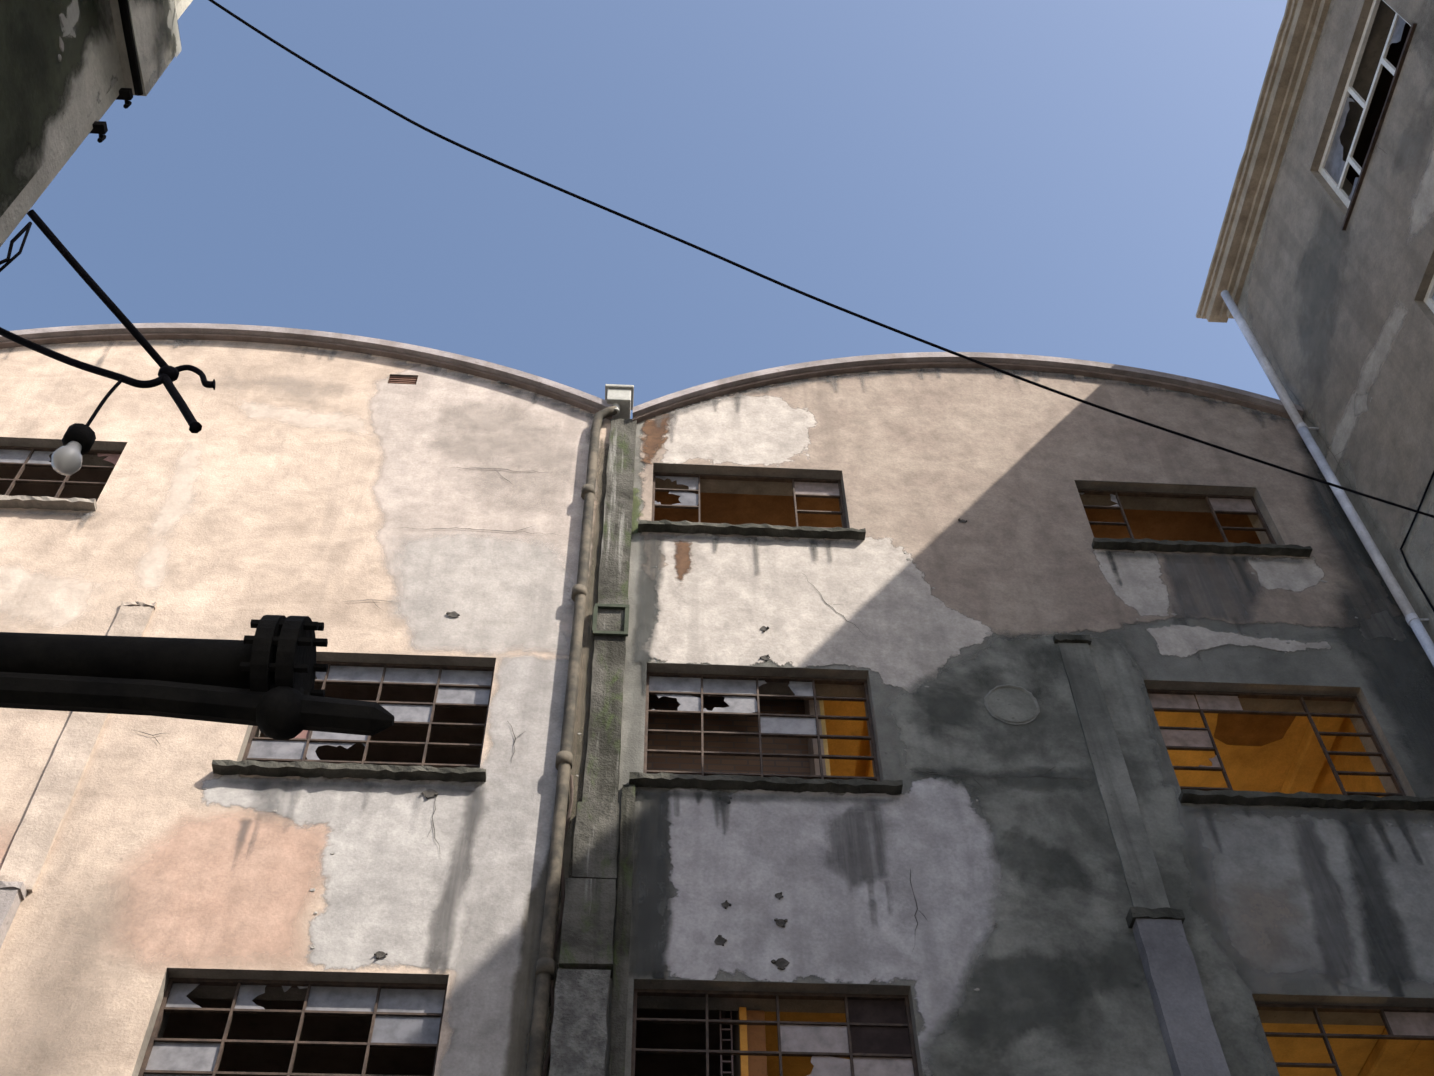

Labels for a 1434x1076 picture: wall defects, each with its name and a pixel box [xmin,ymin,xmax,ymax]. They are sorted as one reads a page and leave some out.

water stain [157,0,180,61]
water stain [0,0,107,217]
corrosion [674,541,691,580]
flaking render [639,0,1434,1076]
flaking render [122,366,600,1076]
water stain [993,769,1095,789]
water stain [426,794,481,974]
water stain [831,798,884,885]
water stain [998,834,1090,886]
water stain [962,954,1092,1042]